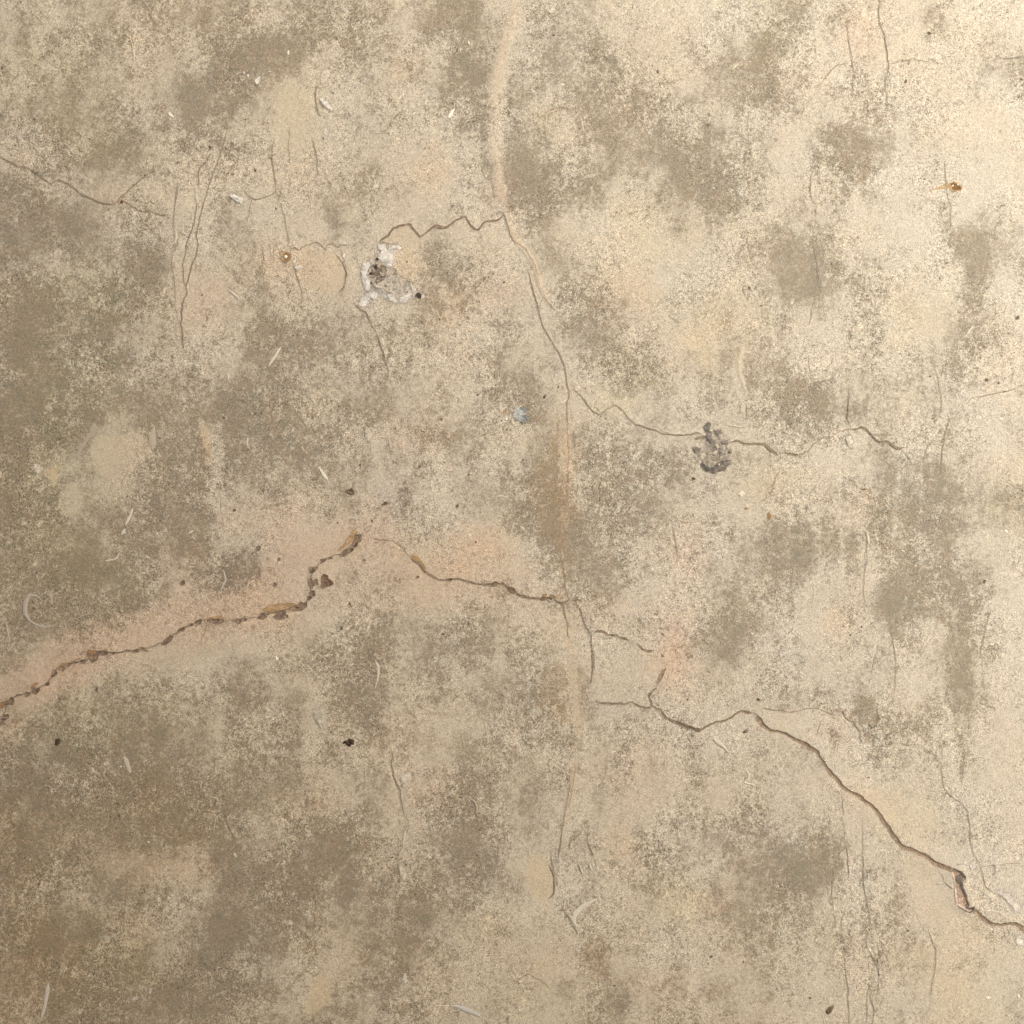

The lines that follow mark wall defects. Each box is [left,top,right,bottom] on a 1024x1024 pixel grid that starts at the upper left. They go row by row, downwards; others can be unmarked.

crack [0,127,227,349]
peeling [295,225,429,307]
crack [809,165,819,325]
crack [0,213,1024,1024]